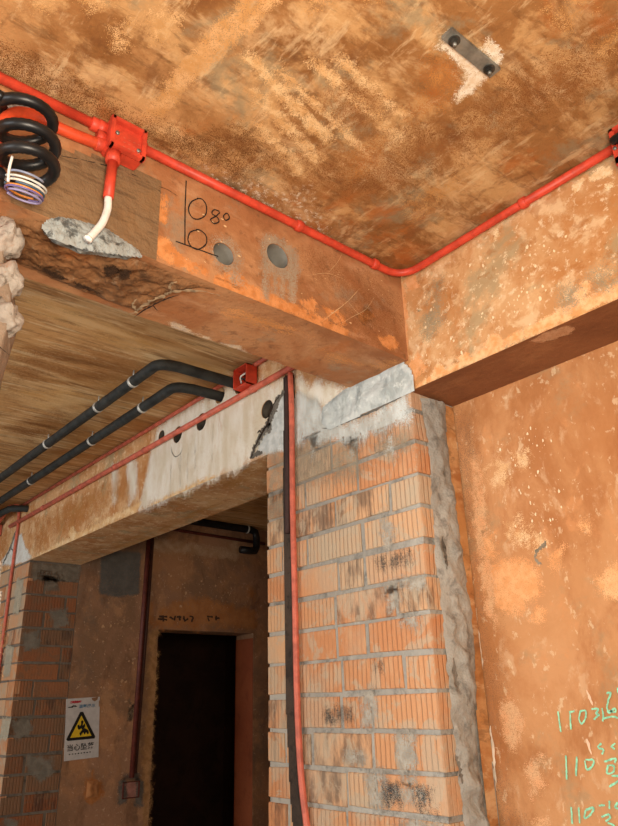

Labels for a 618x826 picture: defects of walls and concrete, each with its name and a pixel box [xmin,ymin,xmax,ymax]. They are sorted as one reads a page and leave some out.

peeling [159,193,170,225]
spalling [11,219,349,337]
peeling [167,321,247,353]
water stain [373,547,414,575]
water stain [377,777,440,820]